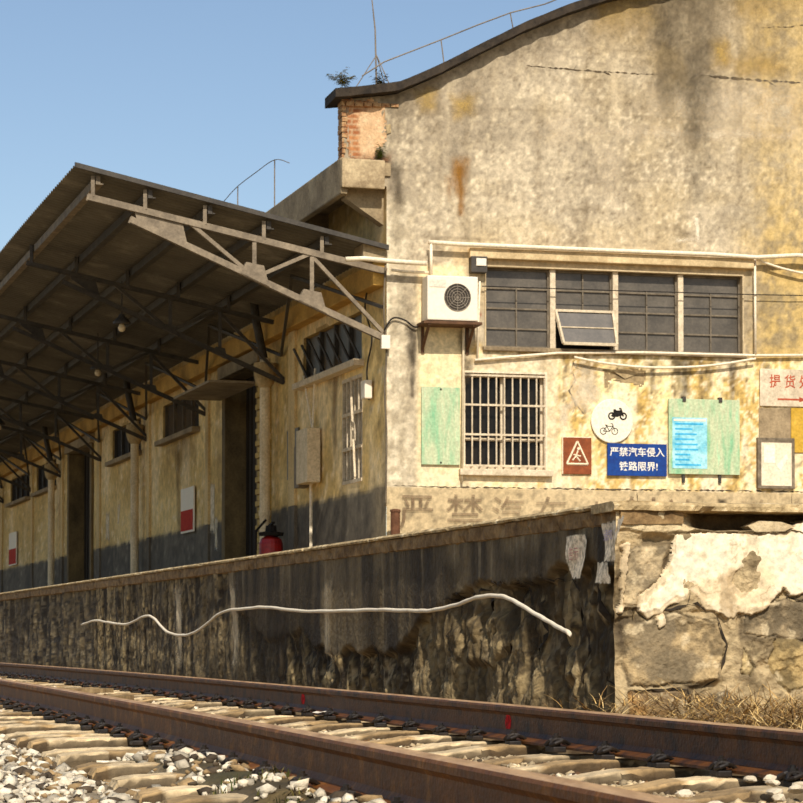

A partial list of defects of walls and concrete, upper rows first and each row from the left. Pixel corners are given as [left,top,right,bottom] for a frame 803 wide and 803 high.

crack [528,65,648,75]
crack [704,75,801,85]
flaking render [345,98,391,159]
peeling [615,542,630,614]
peeling [637,519,803,629]